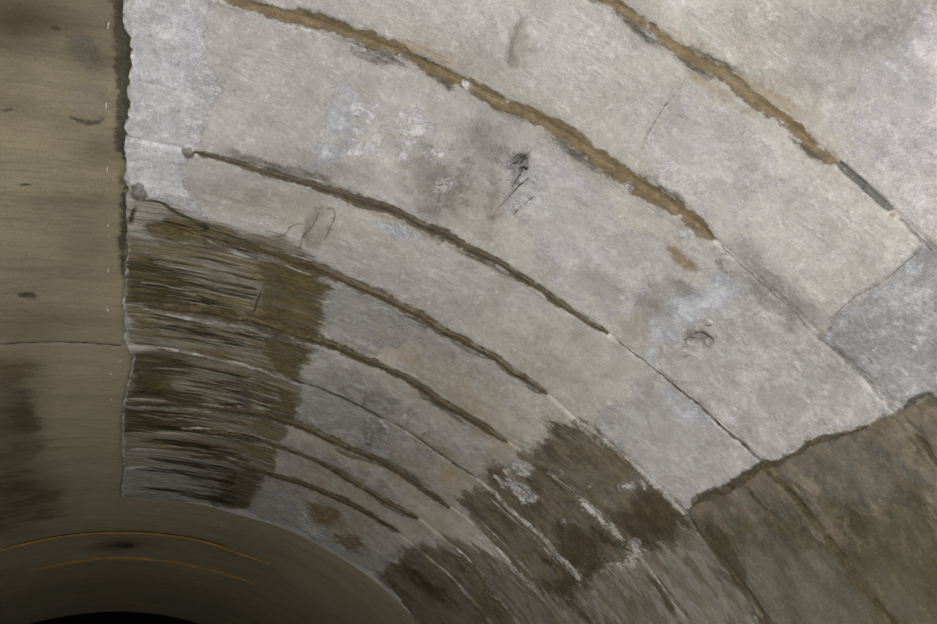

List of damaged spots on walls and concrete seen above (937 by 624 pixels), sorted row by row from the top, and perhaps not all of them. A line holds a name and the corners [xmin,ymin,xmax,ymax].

water stain [109,0,281,505]
crack [240,207,335,248]
corrosion [210,0,715,243]
crack [495,157,534,214]
water stain [249,16,937,624]
corrosion [590,0,896,216]
crack [721,218,931,412]
crack [292,379,477,478]
crack [614,337,896,624]
crack [916,434,937,466]